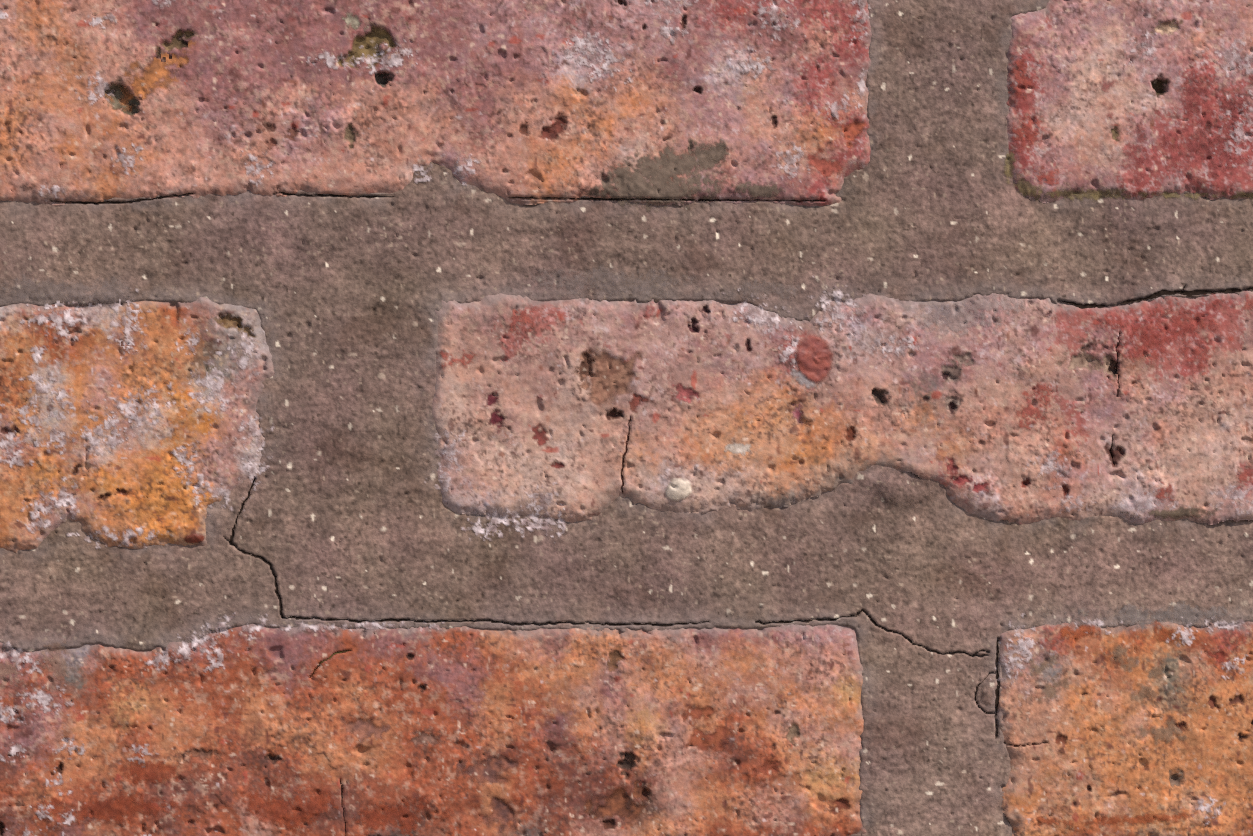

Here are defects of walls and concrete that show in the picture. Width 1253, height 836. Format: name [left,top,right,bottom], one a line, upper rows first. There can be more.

crack [1058,287,1253,390]
crack [230,480,709,677]
crack [755,610,1046,746]